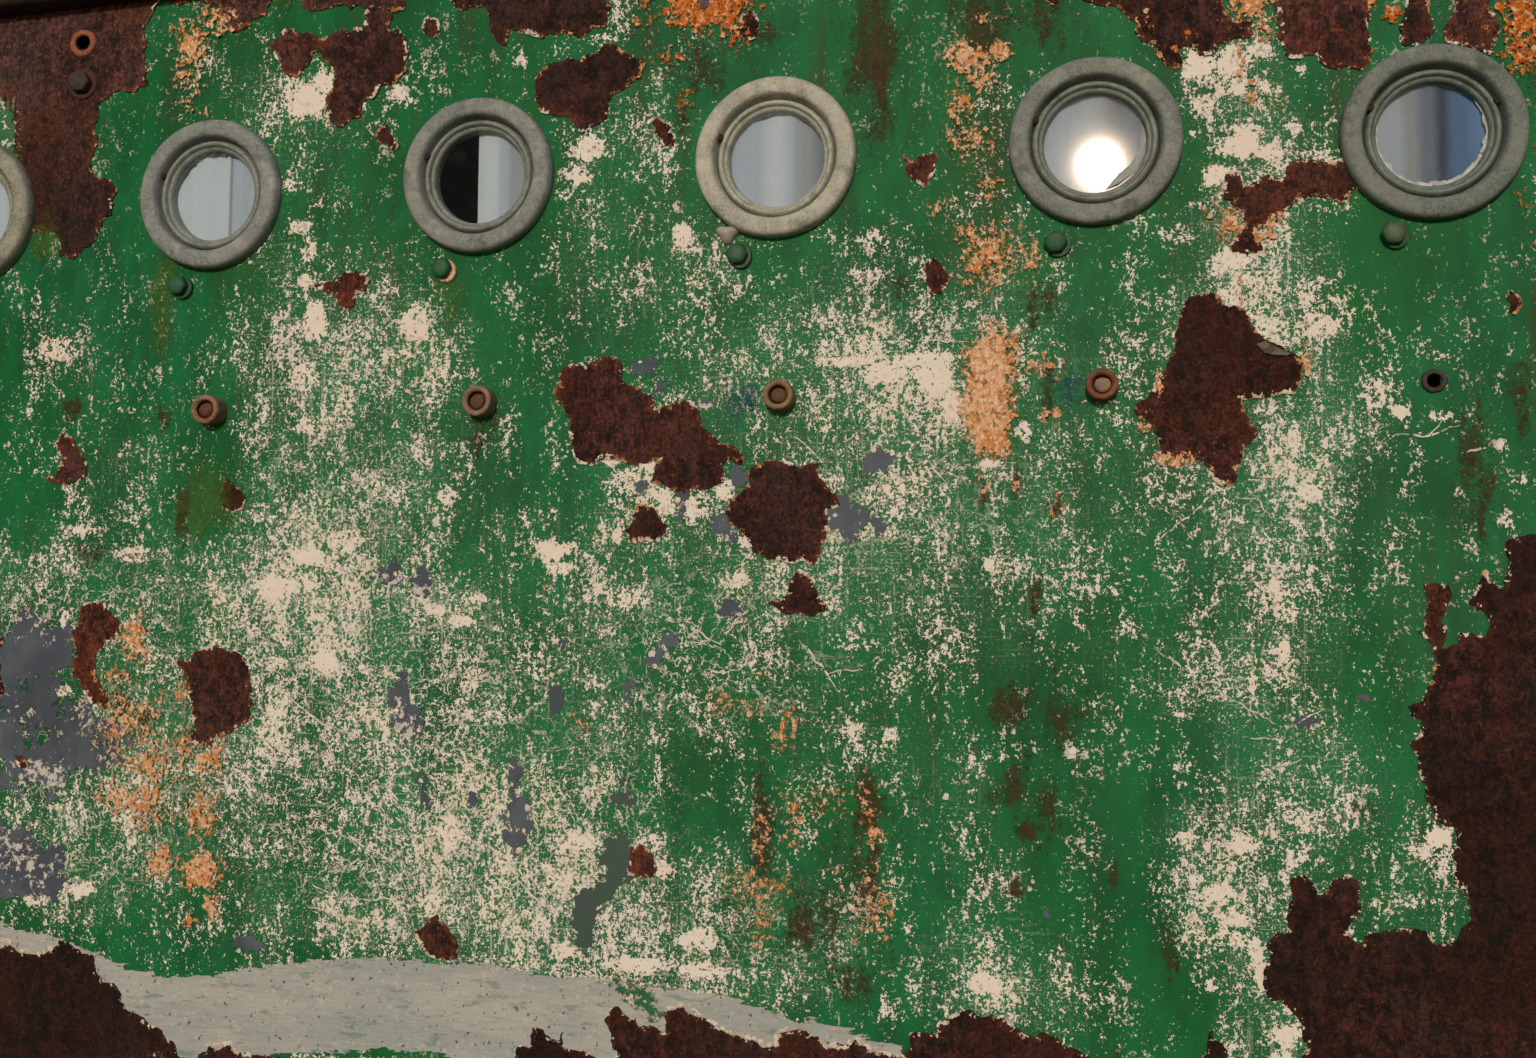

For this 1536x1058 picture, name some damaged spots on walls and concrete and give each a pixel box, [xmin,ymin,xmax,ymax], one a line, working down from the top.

corrosion [895,0,1065,504]
corrosion [1134,158,1358,487]
peeling [56,600,74,629]
peeling [55,684,83,697]
corrosion [0,940,280,1058]
corrosion [71,598,254,928]
peeling [0,778,903,1058]
corrosion [553,356,840,617]
corrosion [604,1006,1091,1058]
peeling [940,856,1063,1027]
peeling [1063,743,1081,764]
corrosion [1263,534,1536,1058]